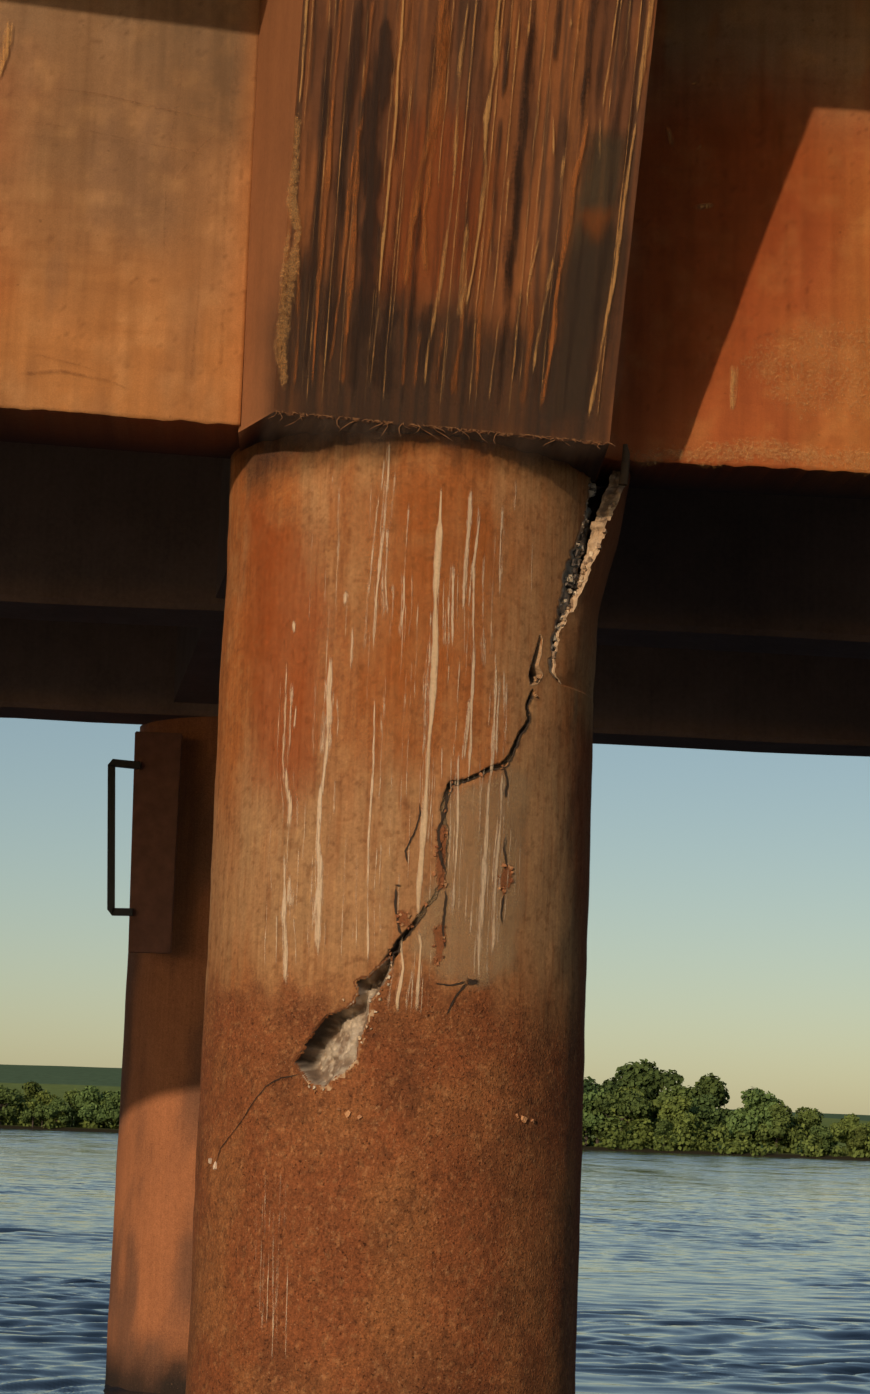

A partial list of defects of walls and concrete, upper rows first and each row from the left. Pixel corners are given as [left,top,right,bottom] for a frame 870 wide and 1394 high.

leakage [248,0,654,1008]
spalling [528,470,625,697]
crack [384,479,592,966]
crack [208,1075,296,1170]
spalling [291,956,395,1093]
crack [437,979,478,1014]
rust [575,739,592,1335]